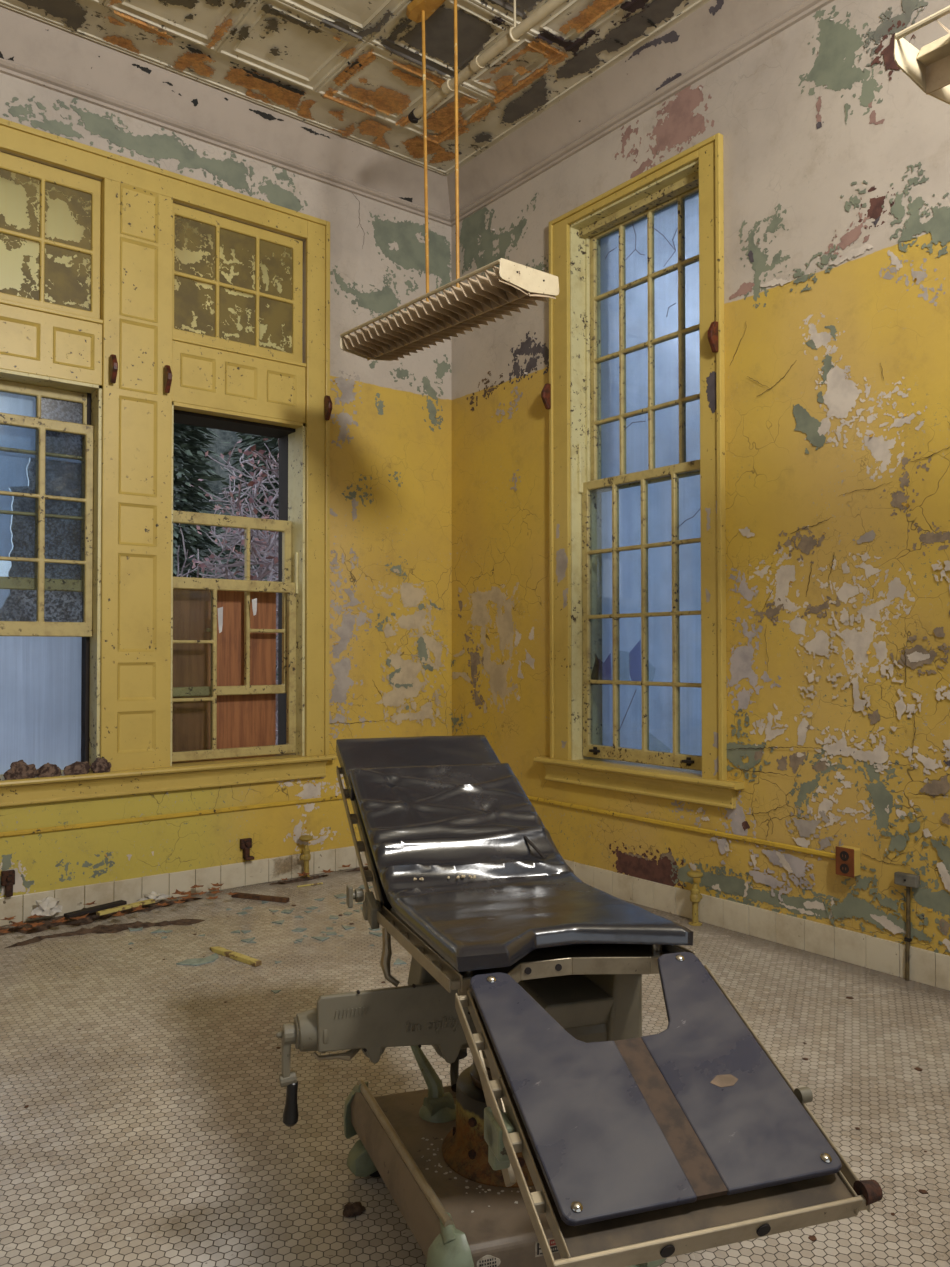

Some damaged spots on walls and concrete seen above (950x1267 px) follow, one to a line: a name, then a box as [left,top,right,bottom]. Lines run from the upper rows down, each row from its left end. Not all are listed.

corrosion [103,0,568,165]
peeling [158,0,551,80]
corrosion [559,0,624,34]
peeling [498,0,689,126]
peeling [798,0,928,129]
peeling [3,96,308,212]
peeling [330,193,537,320]
crack [730,329,796,397]
peeling [793,313,950,590]
crack [727,746,821,833]
peeling [609,525,950,954]
crack [888,643,947,796]